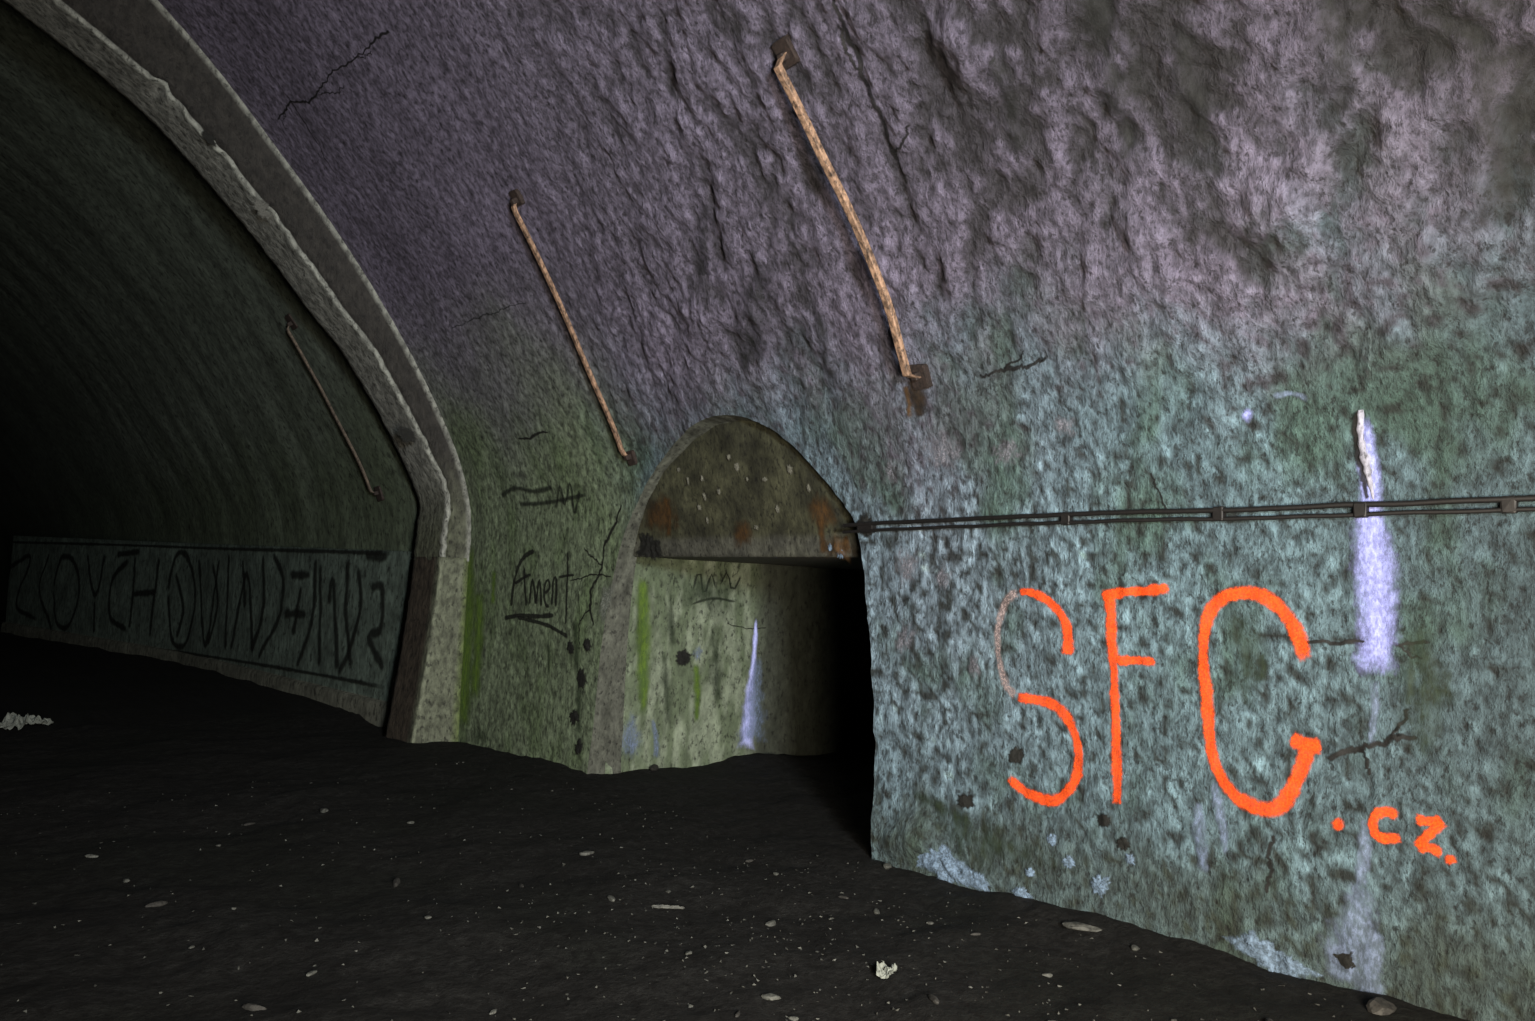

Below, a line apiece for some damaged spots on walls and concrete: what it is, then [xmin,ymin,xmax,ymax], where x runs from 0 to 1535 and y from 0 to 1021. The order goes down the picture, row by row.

crack [265,30,389,176]
corrosion [285,314,384,502]
corrosion [509,189,638,466]
corrosion [772,34,933,416]
leakage [1358,425,1395,665]
crack [1328,709,1418,775]